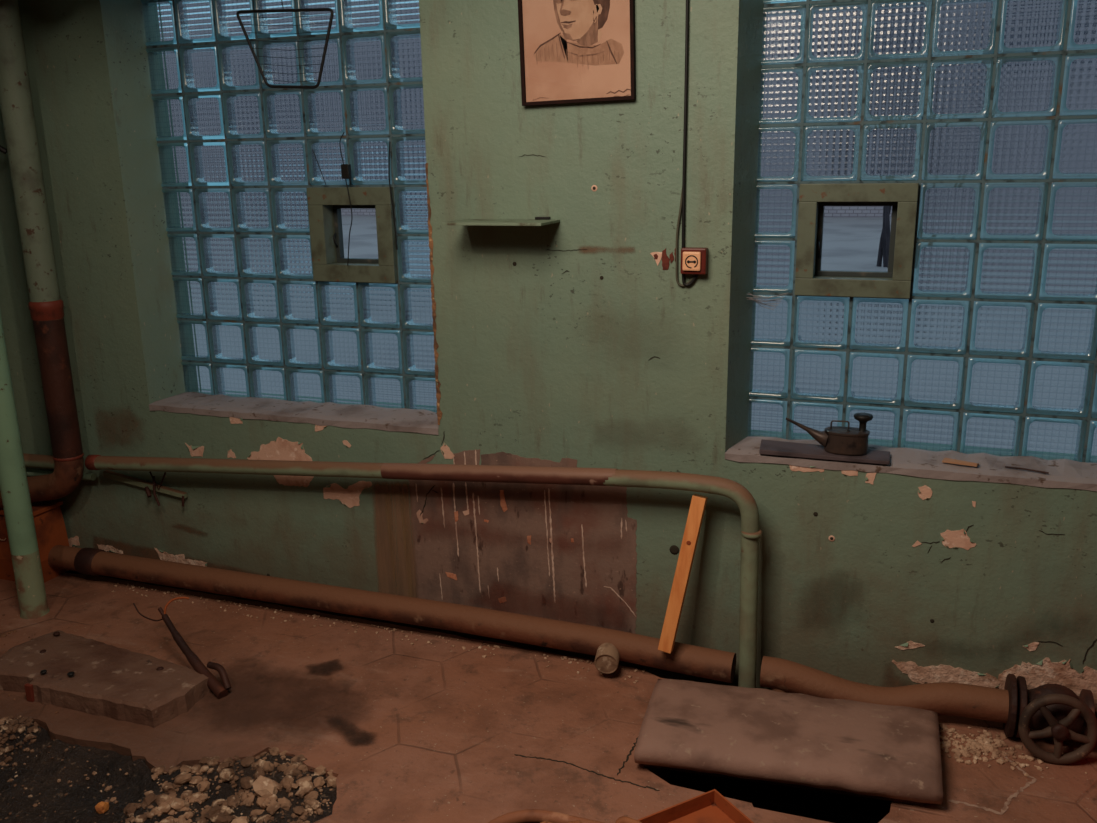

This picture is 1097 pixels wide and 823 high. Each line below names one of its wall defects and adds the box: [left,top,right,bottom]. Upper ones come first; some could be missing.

peeling [185,443,204,457]
peeling [227,437,312,461]
peeling [323,481,373,508]
peeling [918,485,932,500]
peeling [940,529,976,550]
crack [1038,639,1097,663]
flaking render [892,641,1097,713]